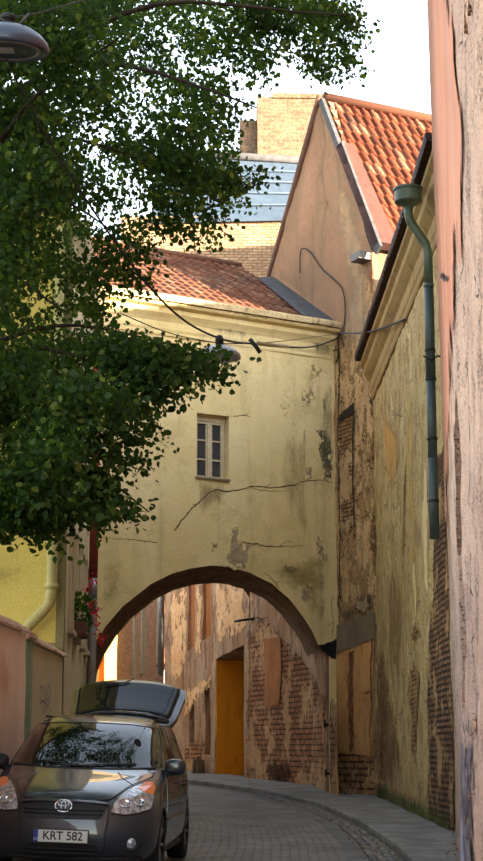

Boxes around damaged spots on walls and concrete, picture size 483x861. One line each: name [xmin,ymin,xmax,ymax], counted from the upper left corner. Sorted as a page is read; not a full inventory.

peeling [212,525,253,571]
crack [175,356,344,653]
flaking render [215,582,401,795]
peeling [305,429,344,479]
flaking render [407,434,477,861]